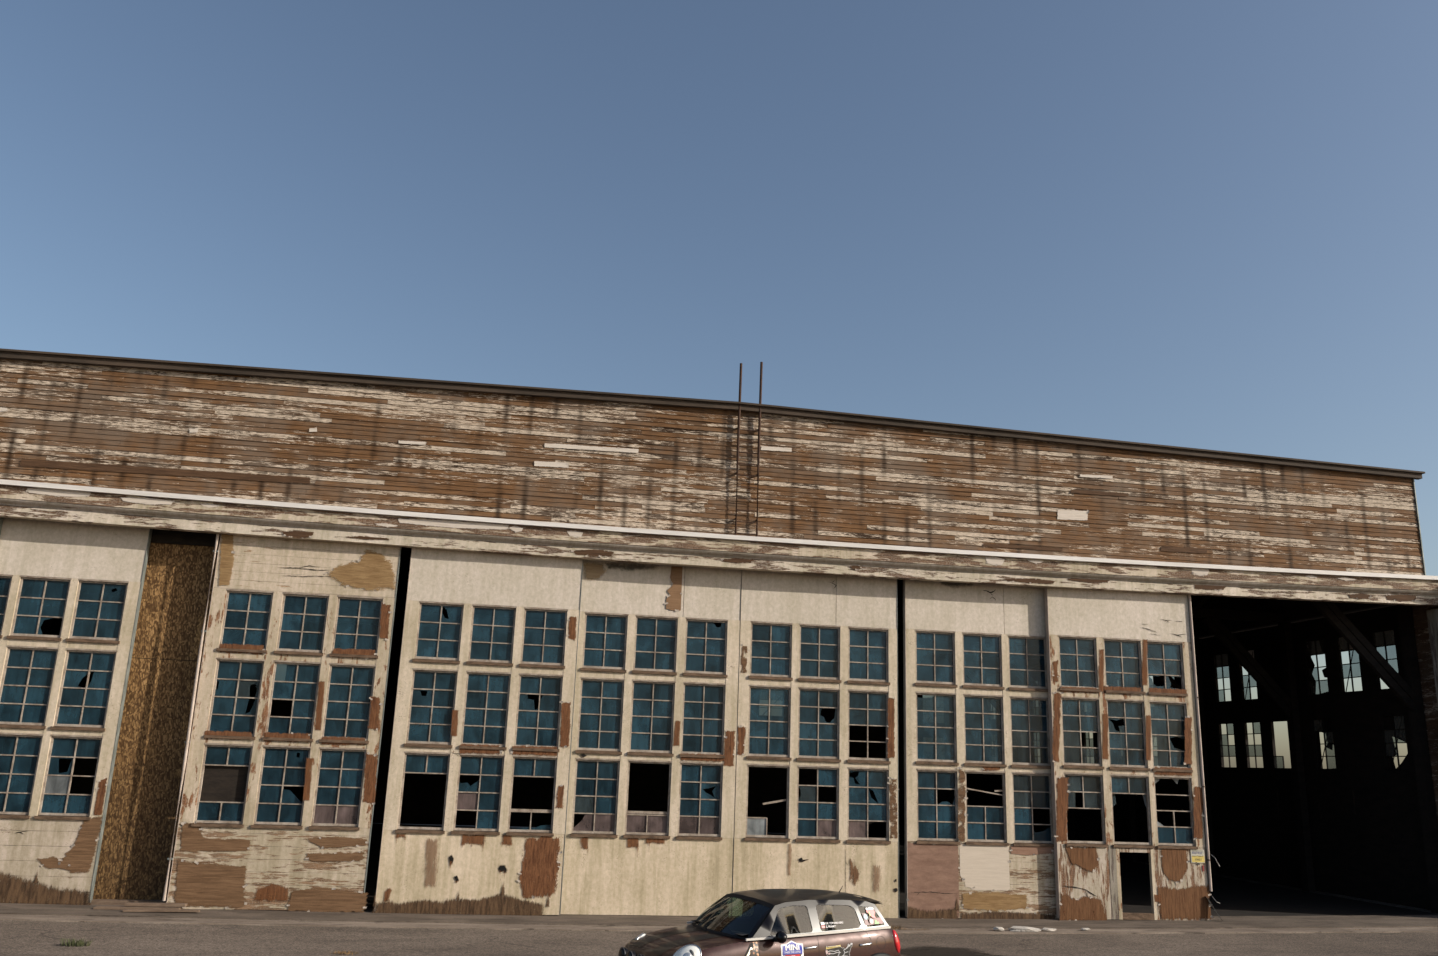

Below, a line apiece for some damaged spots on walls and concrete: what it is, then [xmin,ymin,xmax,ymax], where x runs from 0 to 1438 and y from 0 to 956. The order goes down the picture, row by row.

peeling [283,530,314,539]
peeling [325,523,397,660]
peeling [985,557,1110,584]
peeling [1192,572,1226,591]
peeling [305,836,368,863]
peeling [174,821,251,909]
peeling [498,836,562,899]
peeling [287,887,368,913]
peeling [958,867,1029,913]
peeling [1059,893,1107,920]